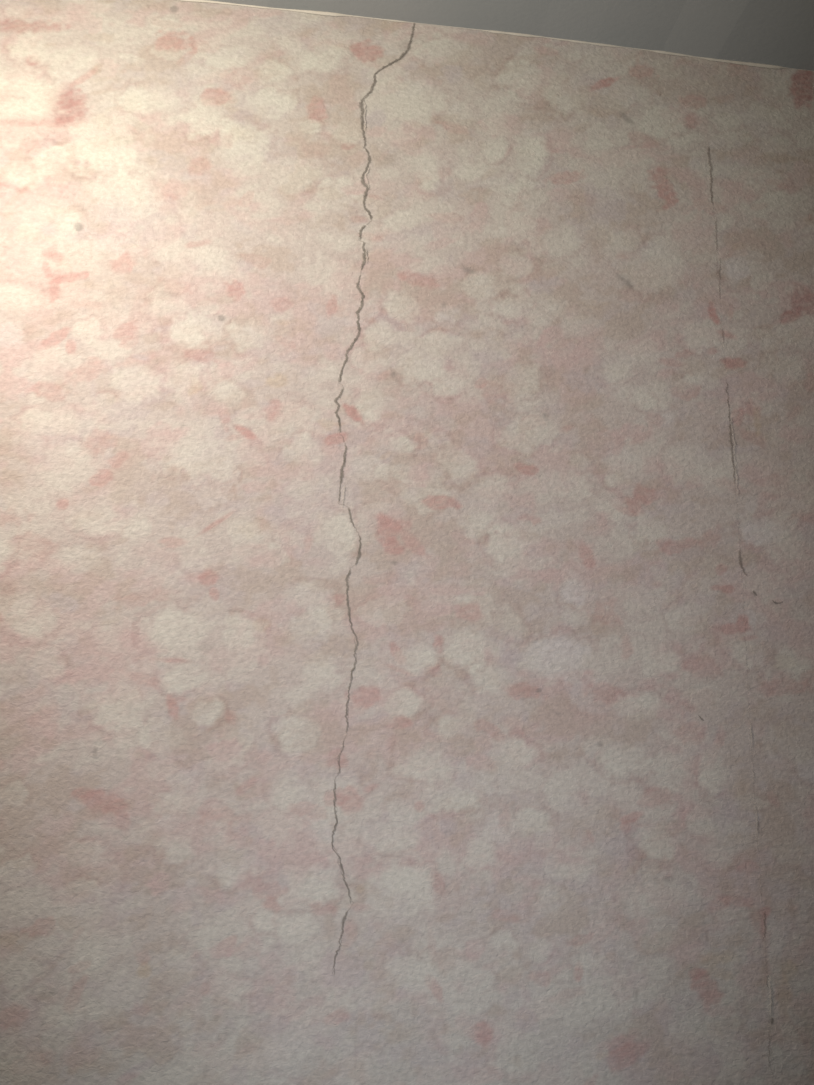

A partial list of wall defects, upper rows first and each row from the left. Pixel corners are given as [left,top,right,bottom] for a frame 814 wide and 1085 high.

crack [335,25,414,728]